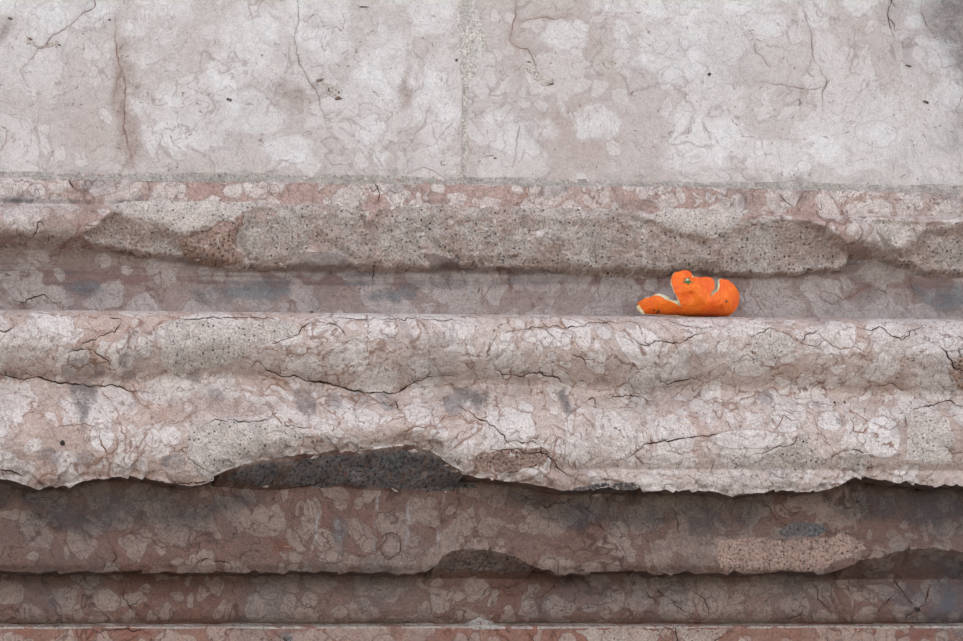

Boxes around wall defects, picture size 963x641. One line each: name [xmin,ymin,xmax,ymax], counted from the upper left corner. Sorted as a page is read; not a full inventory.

spalling [83,203,848,317]
spalling [884,221,963,278]
crack [3,317,157,395]
crack [495,319,701,385]
crack [753,326,963,371]
crack [251,317,609,533]
crack [587,378,691,406]
crack [904,400,959,428]
spalling [223,449,478,493]
spalling [465,445,551,474]
spalling [558,480,645,496]
crack [628,433,720,465]